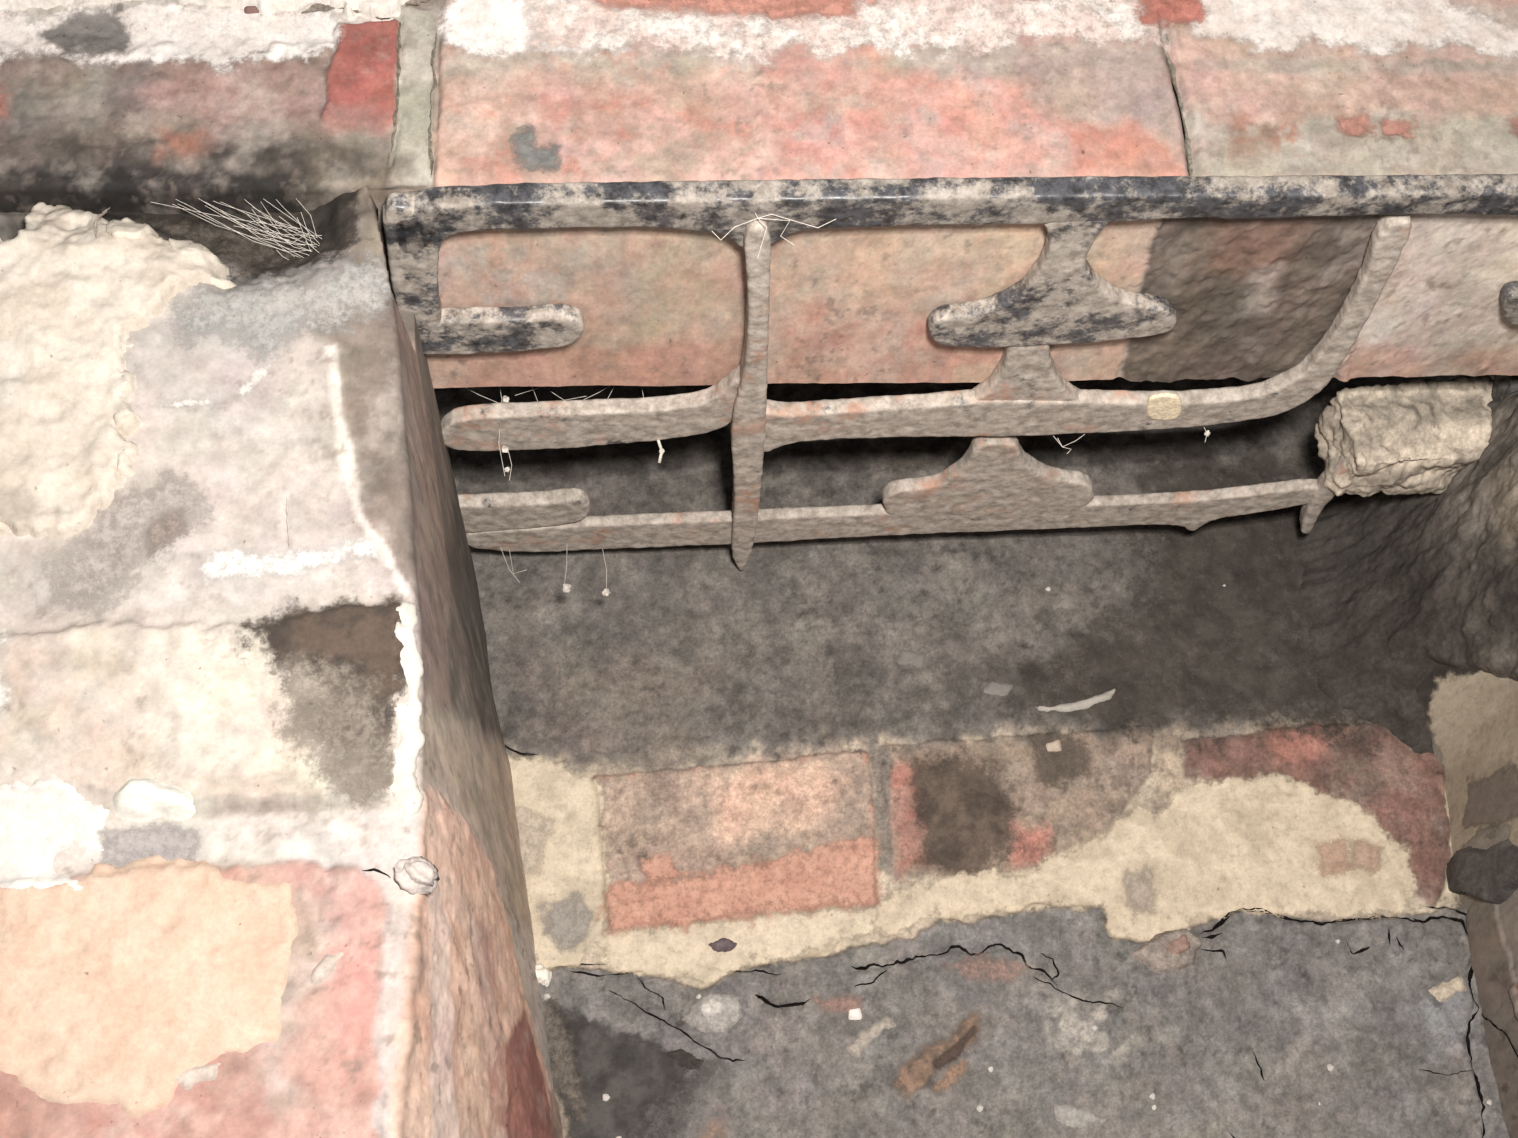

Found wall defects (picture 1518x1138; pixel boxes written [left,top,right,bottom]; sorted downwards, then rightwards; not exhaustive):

peeling [0,202,237,539]
water stain [273,651,395,806]
crack [568,963,745,1062]
crack [732,969,811,1008]
crack [852,943,1123,1008]
crack [1200,906,1518,1138]